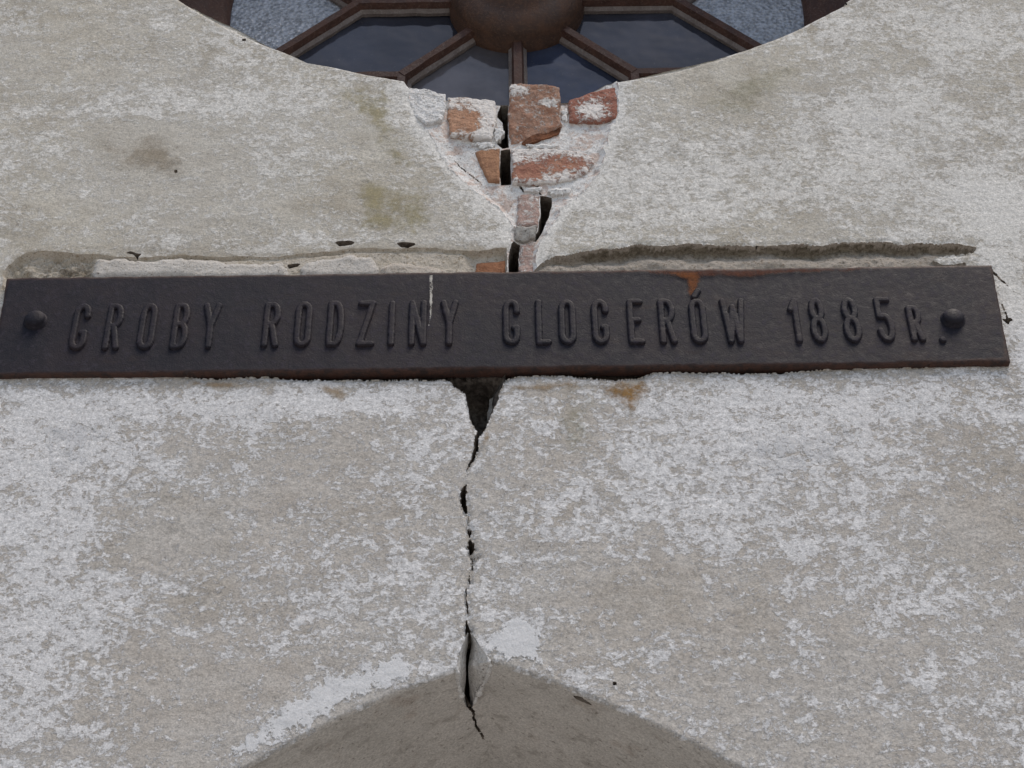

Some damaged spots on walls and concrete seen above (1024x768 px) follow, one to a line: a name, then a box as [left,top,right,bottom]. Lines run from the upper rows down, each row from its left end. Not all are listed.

spalling [1,81,977,290]
crack [455,106,552,272]
rust [650,269,827,292]
crack [460,432,479,649]
crack [465,695,484,739]